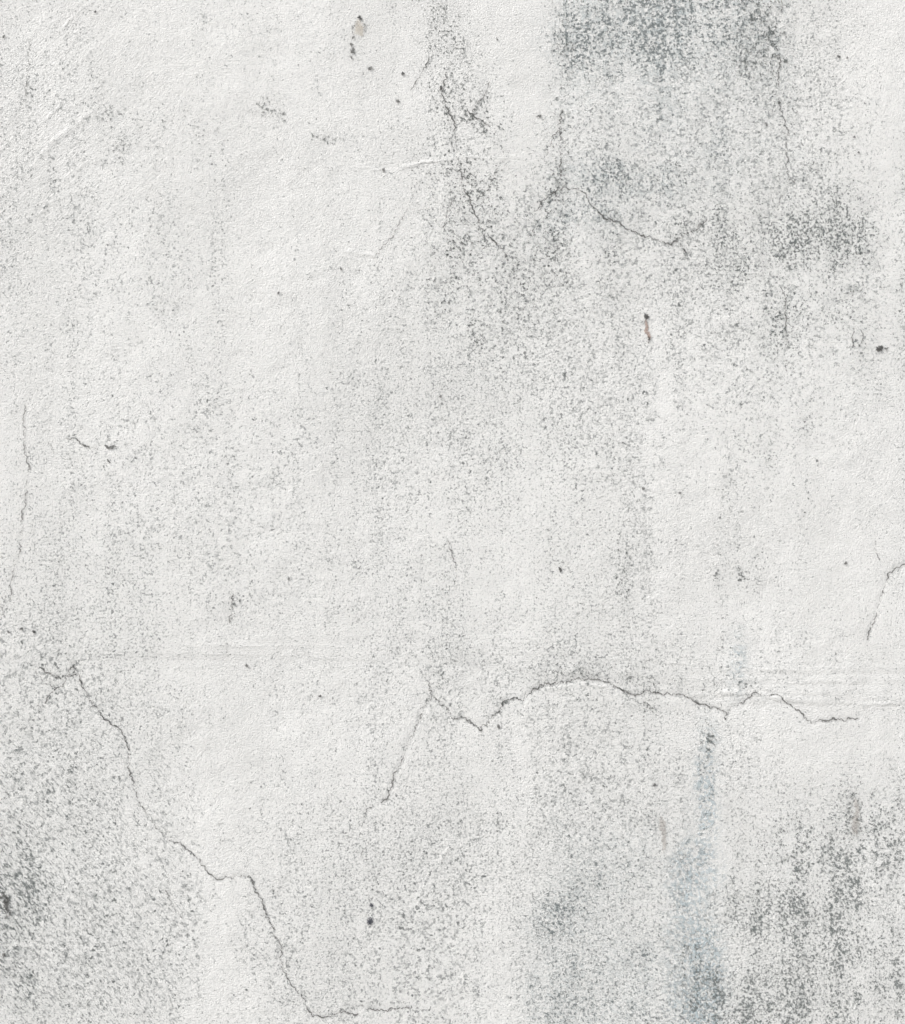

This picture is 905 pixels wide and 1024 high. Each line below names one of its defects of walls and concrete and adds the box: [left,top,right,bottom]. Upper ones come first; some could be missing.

crack [538,110,707,245]
crack [867,541,905,640]
crack [364,677,858,823]
crack [39,665,412,1018]